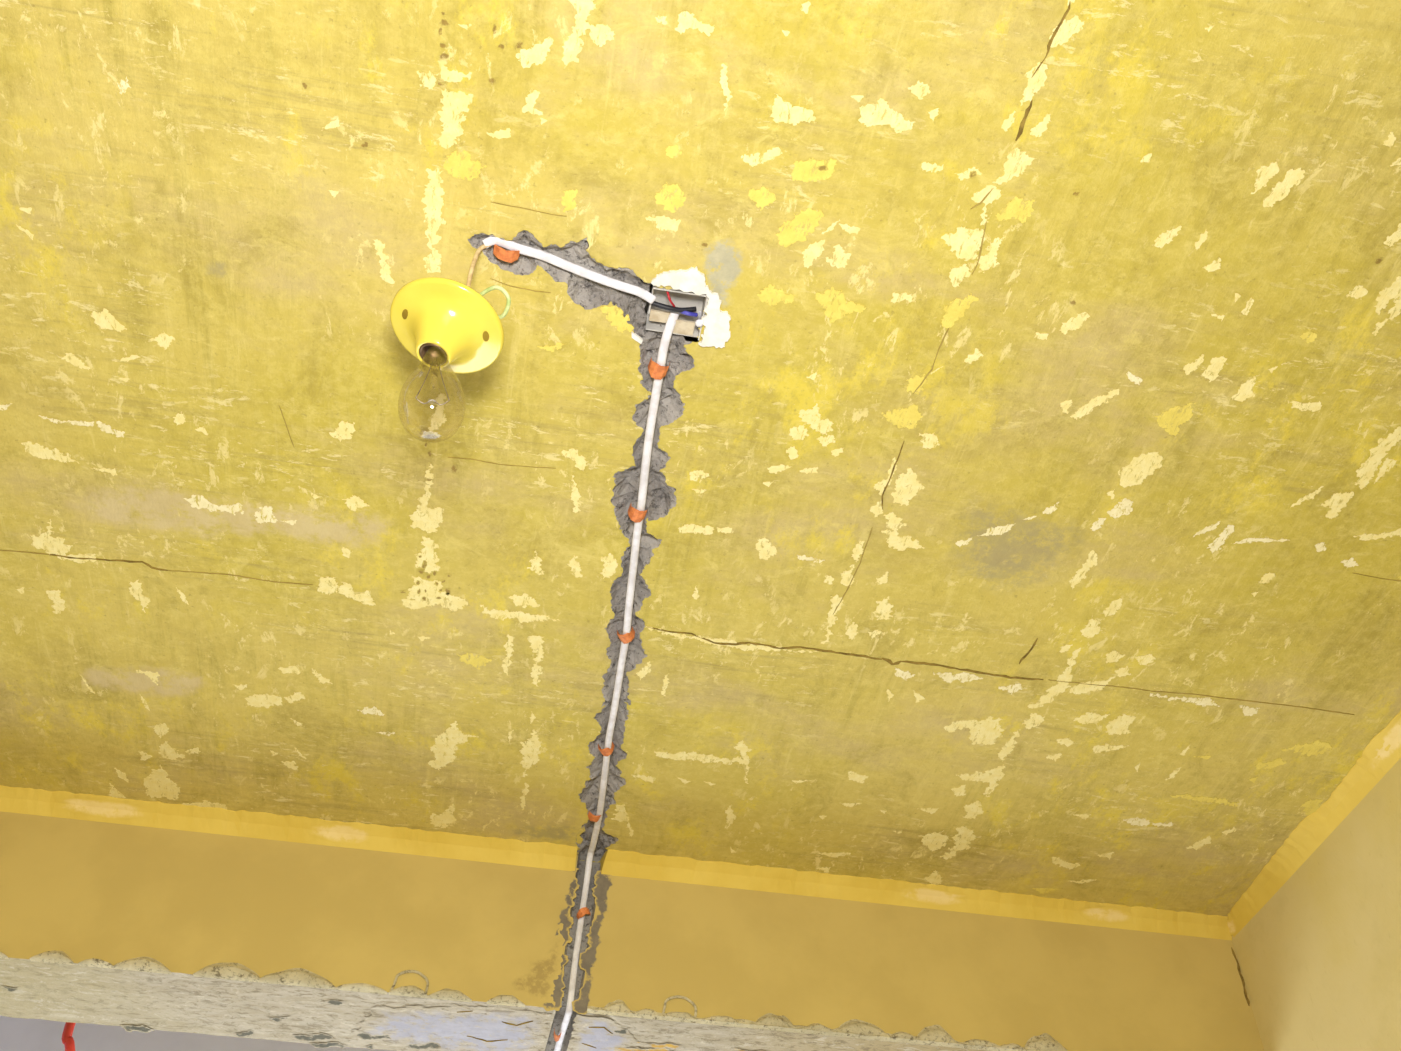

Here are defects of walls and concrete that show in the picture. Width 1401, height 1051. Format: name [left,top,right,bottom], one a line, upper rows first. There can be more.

peeling [516,0,615,68]
peeling [851,81,939,133]
crack [1015,2,1070,141]
crack [971,188,993,274]
crack [913,327,950,394]
crack [833,442,904,614]
peeling [1090,452,1163,531]
peeling [1291,426,1401,519]
peeling [1069,550,1098,589]
peeling [428,721,479,771]
peeling [921,598,1156,885]
spalling [587,995,1067,1051]